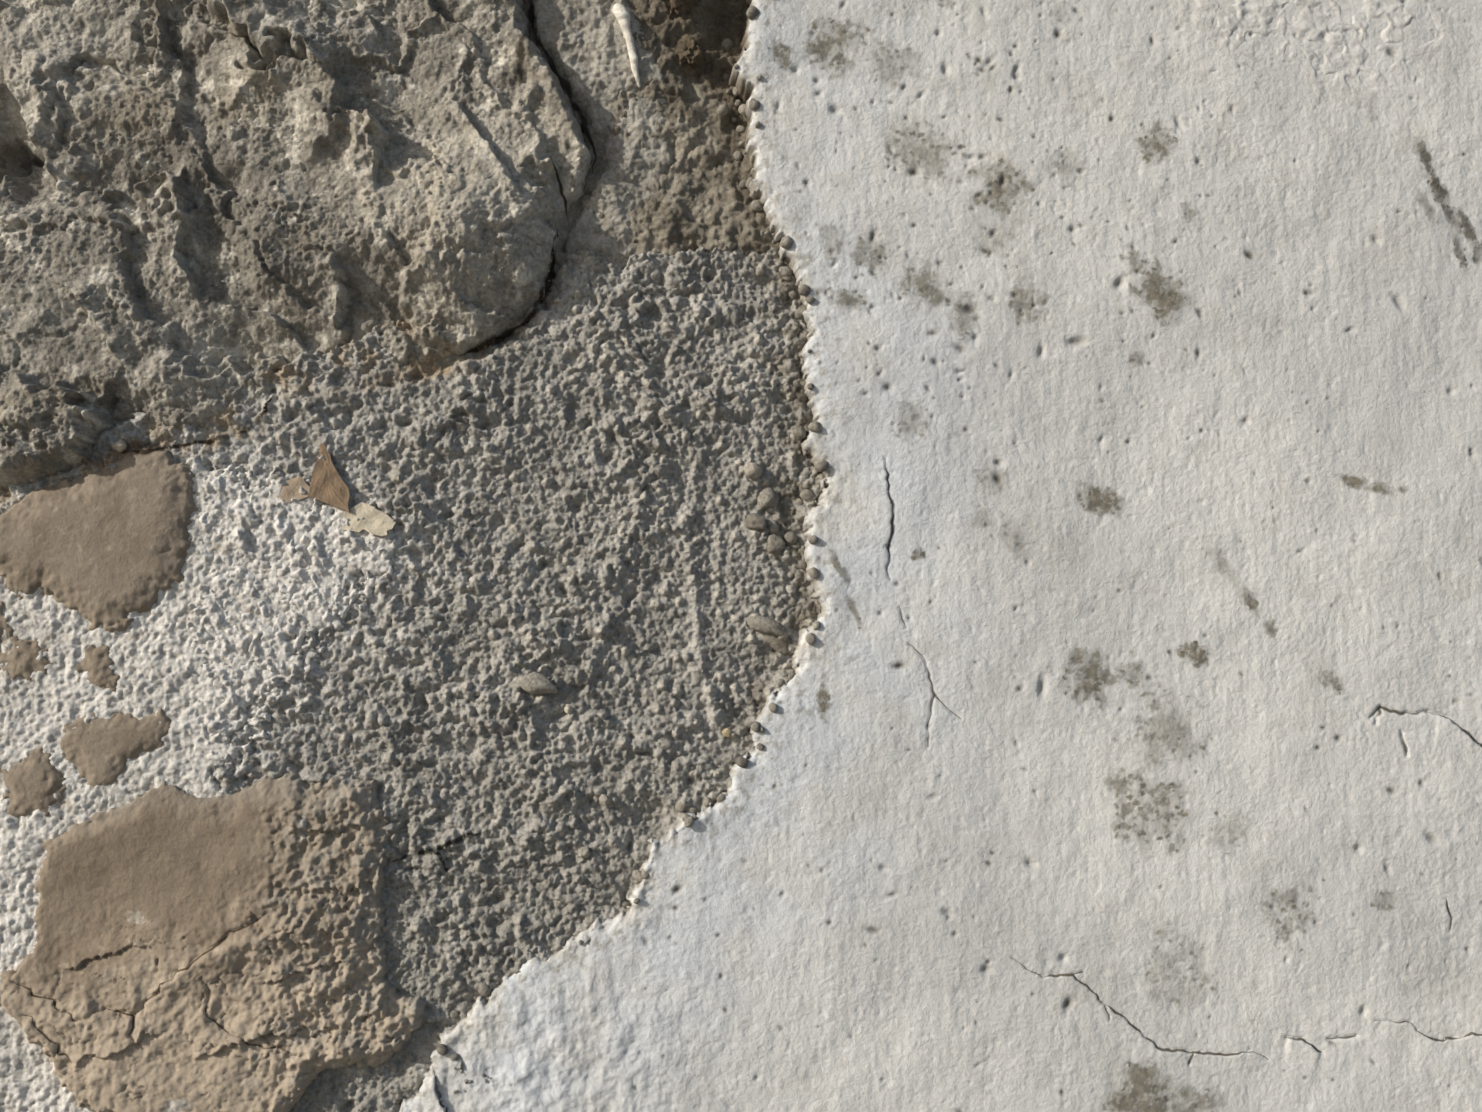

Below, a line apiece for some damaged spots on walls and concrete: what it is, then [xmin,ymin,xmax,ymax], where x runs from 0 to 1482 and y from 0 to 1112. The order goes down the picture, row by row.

crack [466,3,597,354]
water stain [976,159,1035,209]
water stain [1427,176,1482,266]
water stain [1130,252,1185,319]
flaking render [0,0,829,1112]
crack [886,470,961,745]
water stain [1062,652,1155,702]
water stain [1179,641,1208,667]
crack [1371,706,1482,755]
water stain [1115,778,1187,851]
crack [1012,958,1482,1065]
water stain [1110,1062,1209,1112]